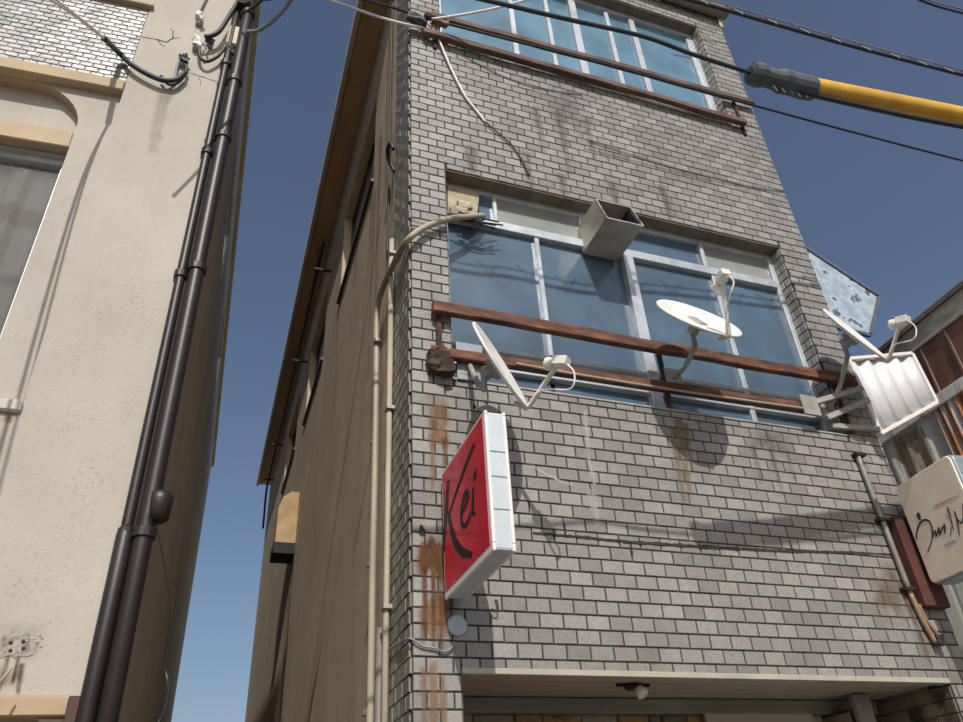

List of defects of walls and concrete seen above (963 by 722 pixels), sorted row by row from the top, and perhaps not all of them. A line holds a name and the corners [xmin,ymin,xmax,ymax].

rust [431,406,447,465]
rust [934,391,963,456]
rust [419,537,452,641]
rust [1,655,23,691]